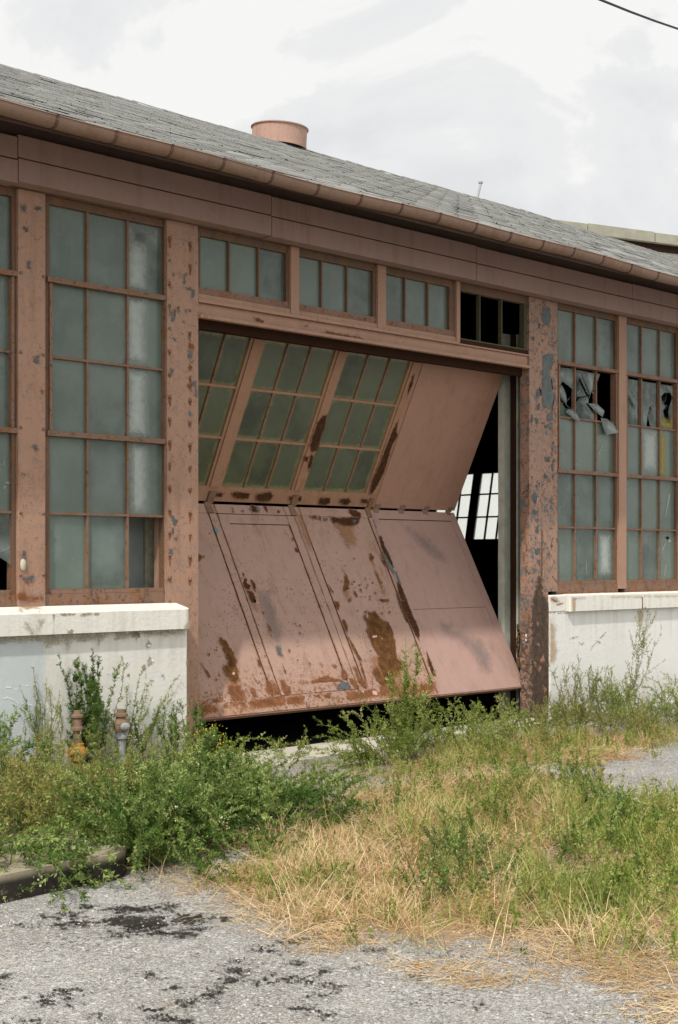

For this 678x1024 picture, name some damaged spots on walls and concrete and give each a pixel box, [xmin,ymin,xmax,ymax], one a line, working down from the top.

peeling [170,306,199,398]
peeling [531,354,555,430]
corrosion [216,490,274,504]
corrosion [292,414,399,552]
corrosion [198,520,436,717]